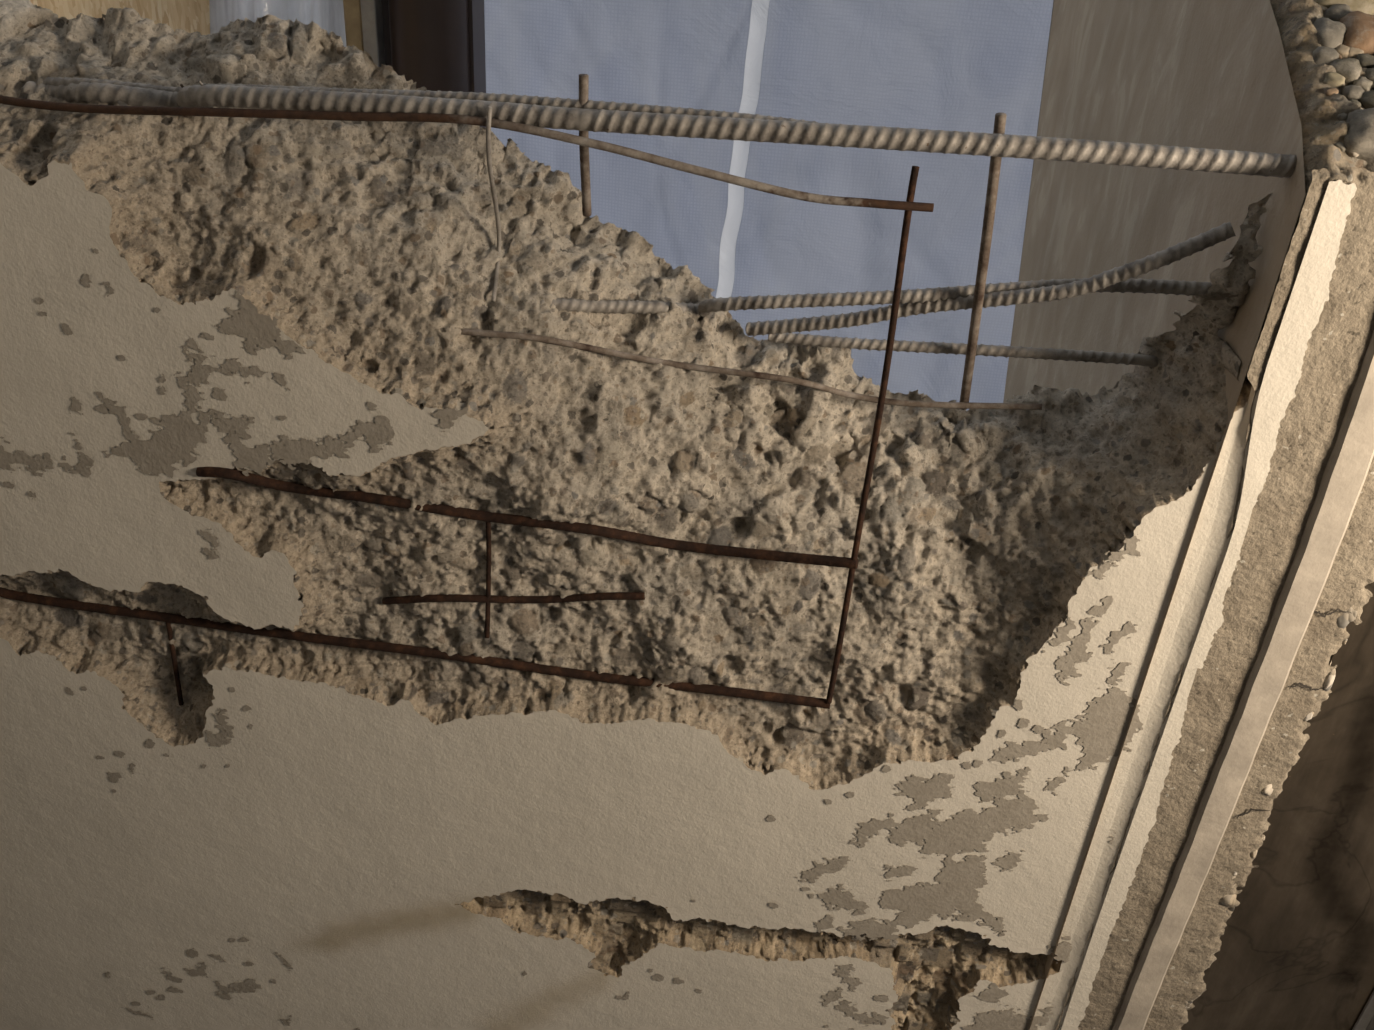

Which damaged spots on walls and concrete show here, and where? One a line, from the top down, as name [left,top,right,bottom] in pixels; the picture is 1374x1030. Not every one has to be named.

spalling [0,0,1374,796]
peeling [121,937,293,1020]
spalling [455,767,1072,1030]